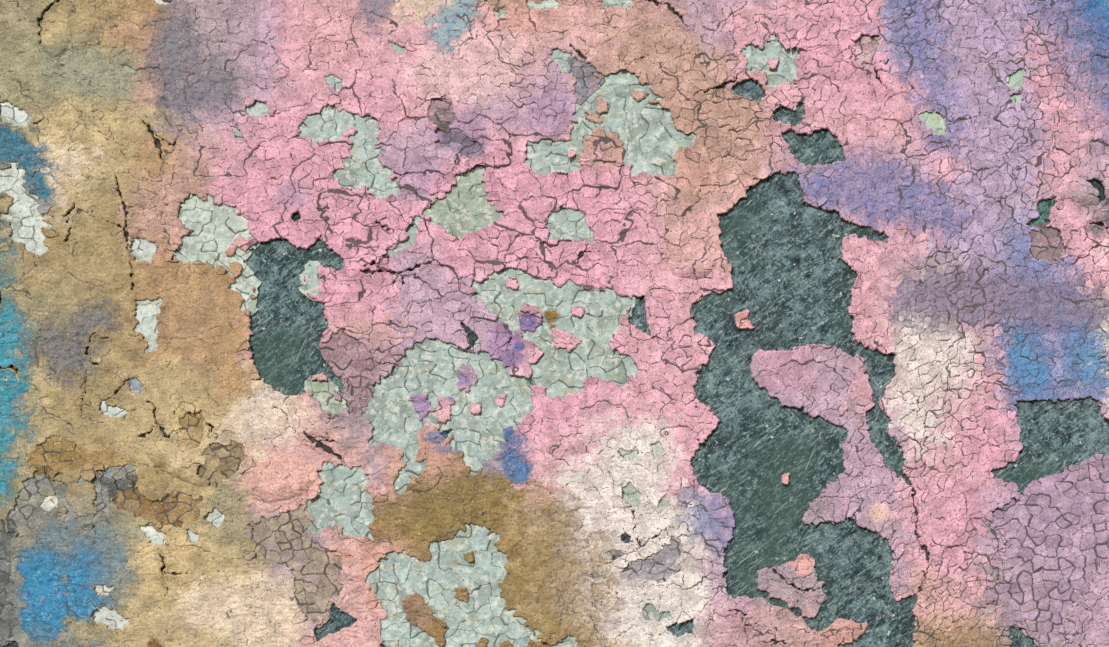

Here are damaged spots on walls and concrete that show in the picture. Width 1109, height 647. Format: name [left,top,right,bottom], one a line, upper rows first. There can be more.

crack [644,0,688,27]
crack [143,121,183,160]
peeling [525,48,700,185]
crack [700,72,742,98]
peeling [0,160,58,256]
crack [360,260,438,285]
spalling [682,31,917,647]
crack [304,431,342,459]
peeling [124,193,664,647]
peeling [603,533,682,584]
crack [909,483,931,592]
peeling [984,396,1109,647]